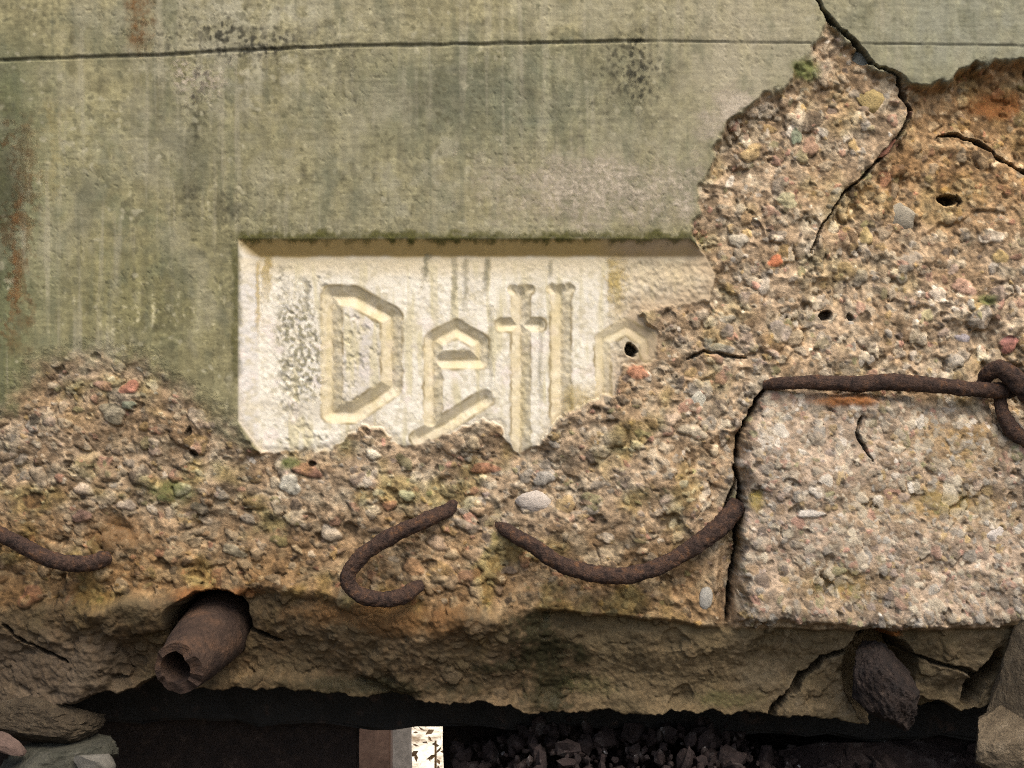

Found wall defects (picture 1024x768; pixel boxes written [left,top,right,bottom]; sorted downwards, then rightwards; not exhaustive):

spalling [668,19,1024,448]
crack [810,0,912,253]
crack [938,133,1024,175]
spalling [0,306,1013,725]
crack [723,388,766,622]
corrosion [818,394,875,406]
crack [855,416,874,461]
crack [768,630,976,716]